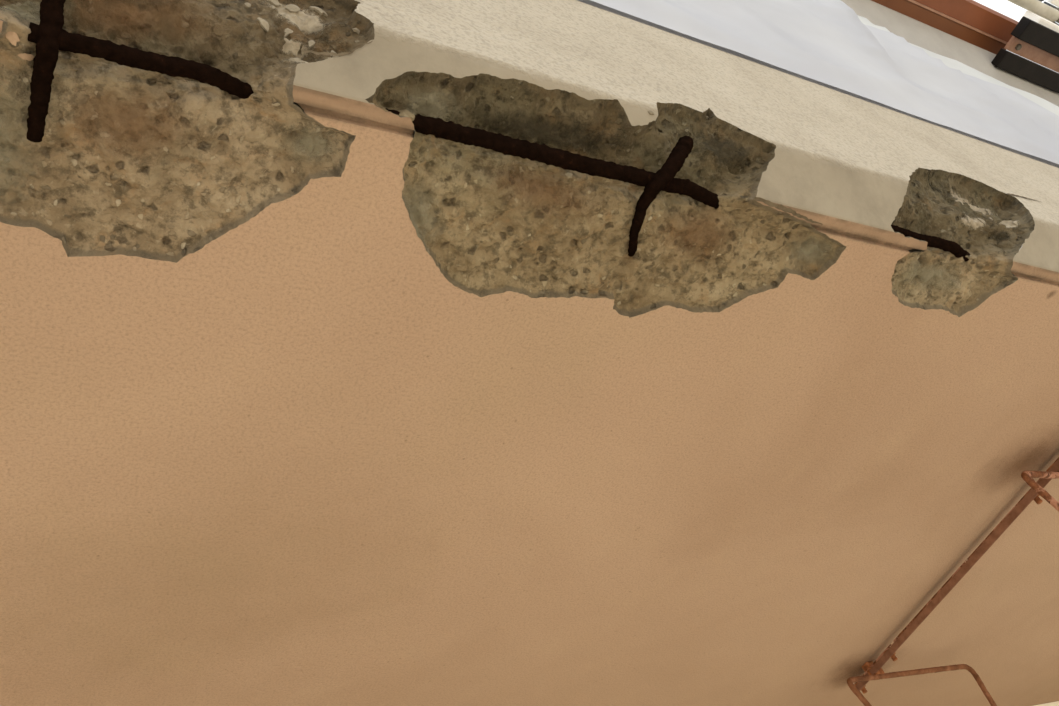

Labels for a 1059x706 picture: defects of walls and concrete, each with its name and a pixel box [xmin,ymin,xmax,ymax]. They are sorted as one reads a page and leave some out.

spalling [0,0,375,263]
spalling [365,71,846,318]
spalling [891,168,1035,317]